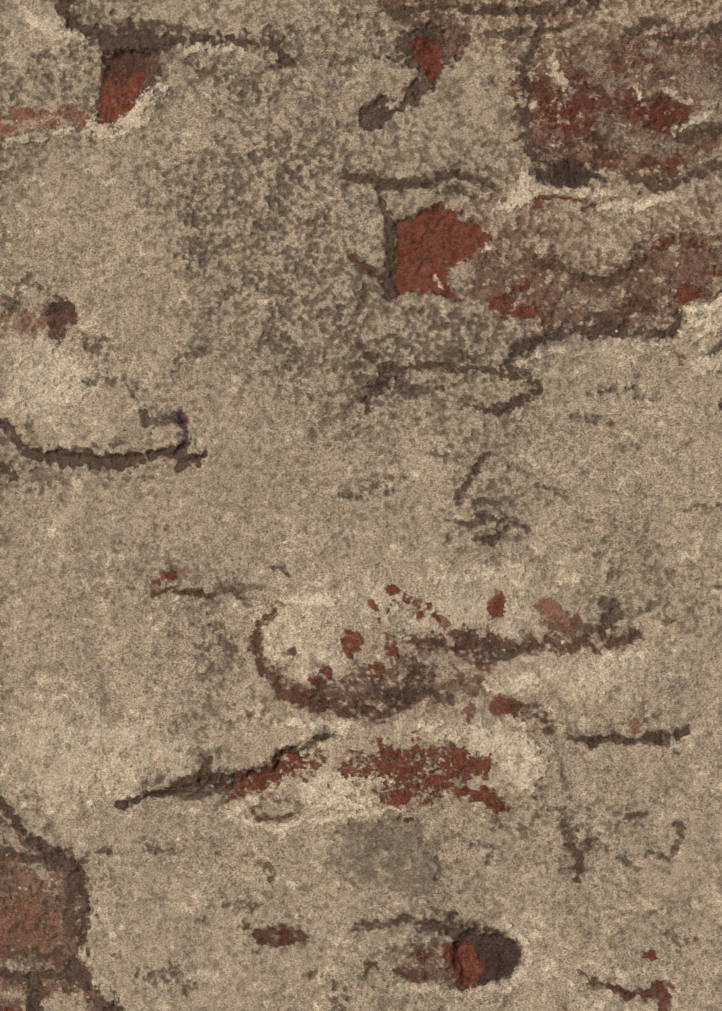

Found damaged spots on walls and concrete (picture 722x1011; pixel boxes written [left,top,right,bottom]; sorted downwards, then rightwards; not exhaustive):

spalling [0,48,151,136]
spalling [359,22,472,131]
spalling [508,22,722,191]
spalling [392,201,722,375]
crack [0,408,207,482]
spalling [208,601,510,823]
spalling [489,693,555,744]
crack [114,731,337,810]
crack [251,797,299,823]
spalling [0,796,127,1011]
spalling [392,923,522,991]